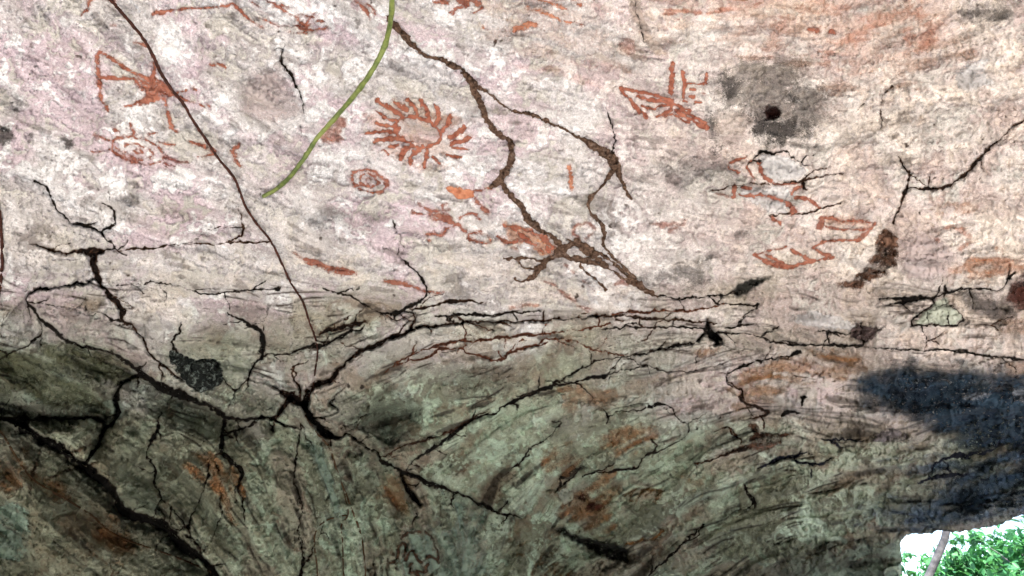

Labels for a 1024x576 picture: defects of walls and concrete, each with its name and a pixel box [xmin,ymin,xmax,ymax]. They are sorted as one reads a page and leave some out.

crack [274,46,304,137]
crack [607,112,617,154]
leakage [722,77,739,100]
crack [712,150,844,217]
crack [892,120,1024,224]
crack [0,180,1024,576]